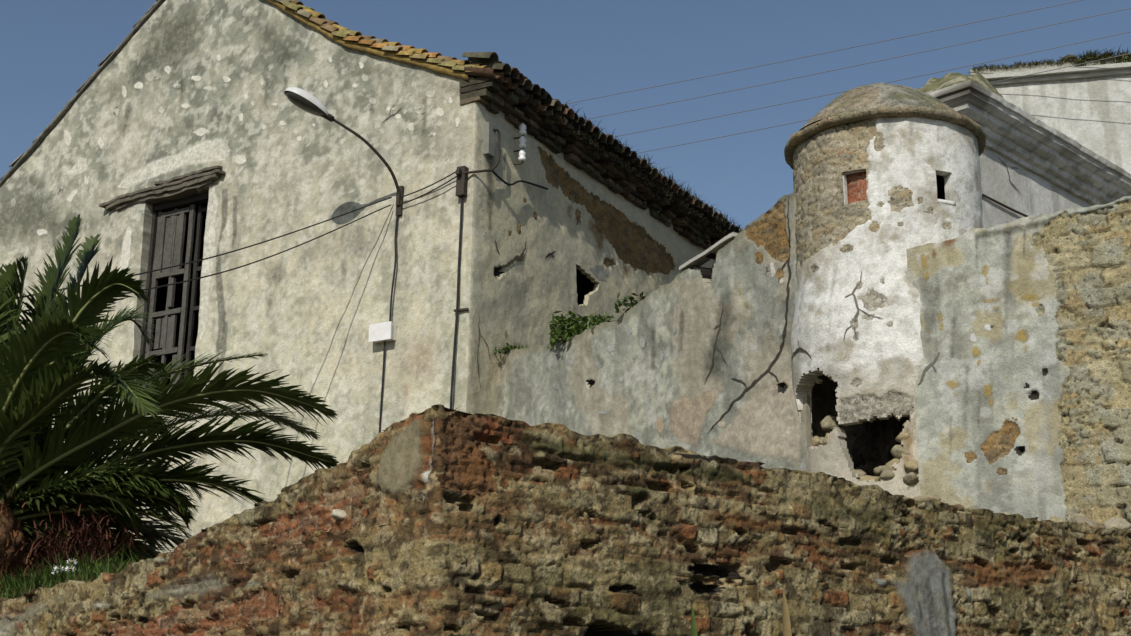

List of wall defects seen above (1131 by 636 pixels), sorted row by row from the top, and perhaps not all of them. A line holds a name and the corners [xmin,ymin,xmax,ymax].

spalling [537,146,675,276]
spalling [745,120,952,284]
crack [674,198,811,474]
crack [844,271,883,338]
flaking render [1030,198,1131,530]
flaking render [715,375,919,485]
spalling [965,417,1025,474]